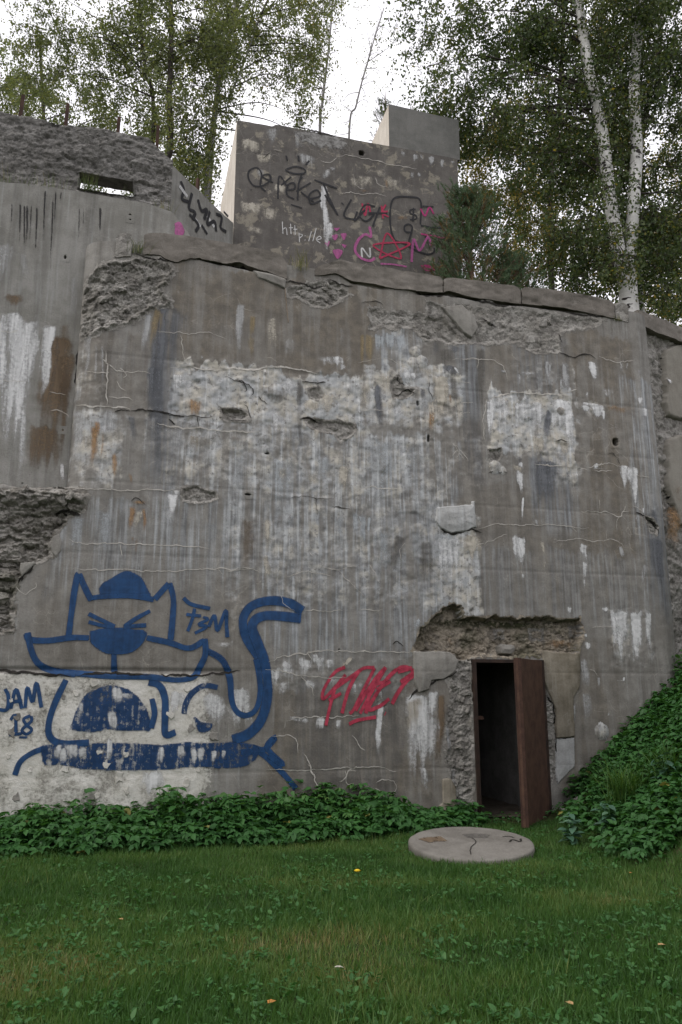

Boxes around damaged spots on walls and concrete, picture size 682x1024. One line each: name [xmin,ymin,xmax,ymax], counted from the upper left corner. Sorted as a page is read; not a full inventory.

damp [11,191,62,247]
spalling [79,255,178,342]
spalling [367,299,607,355]
corrosion [30,337,74,460]
crack [49,331,324,433]
spalling [0,484,92,636]
crack [0,669,240,677]
crack [266,641,415,806]
spalling [410,602,586,807]